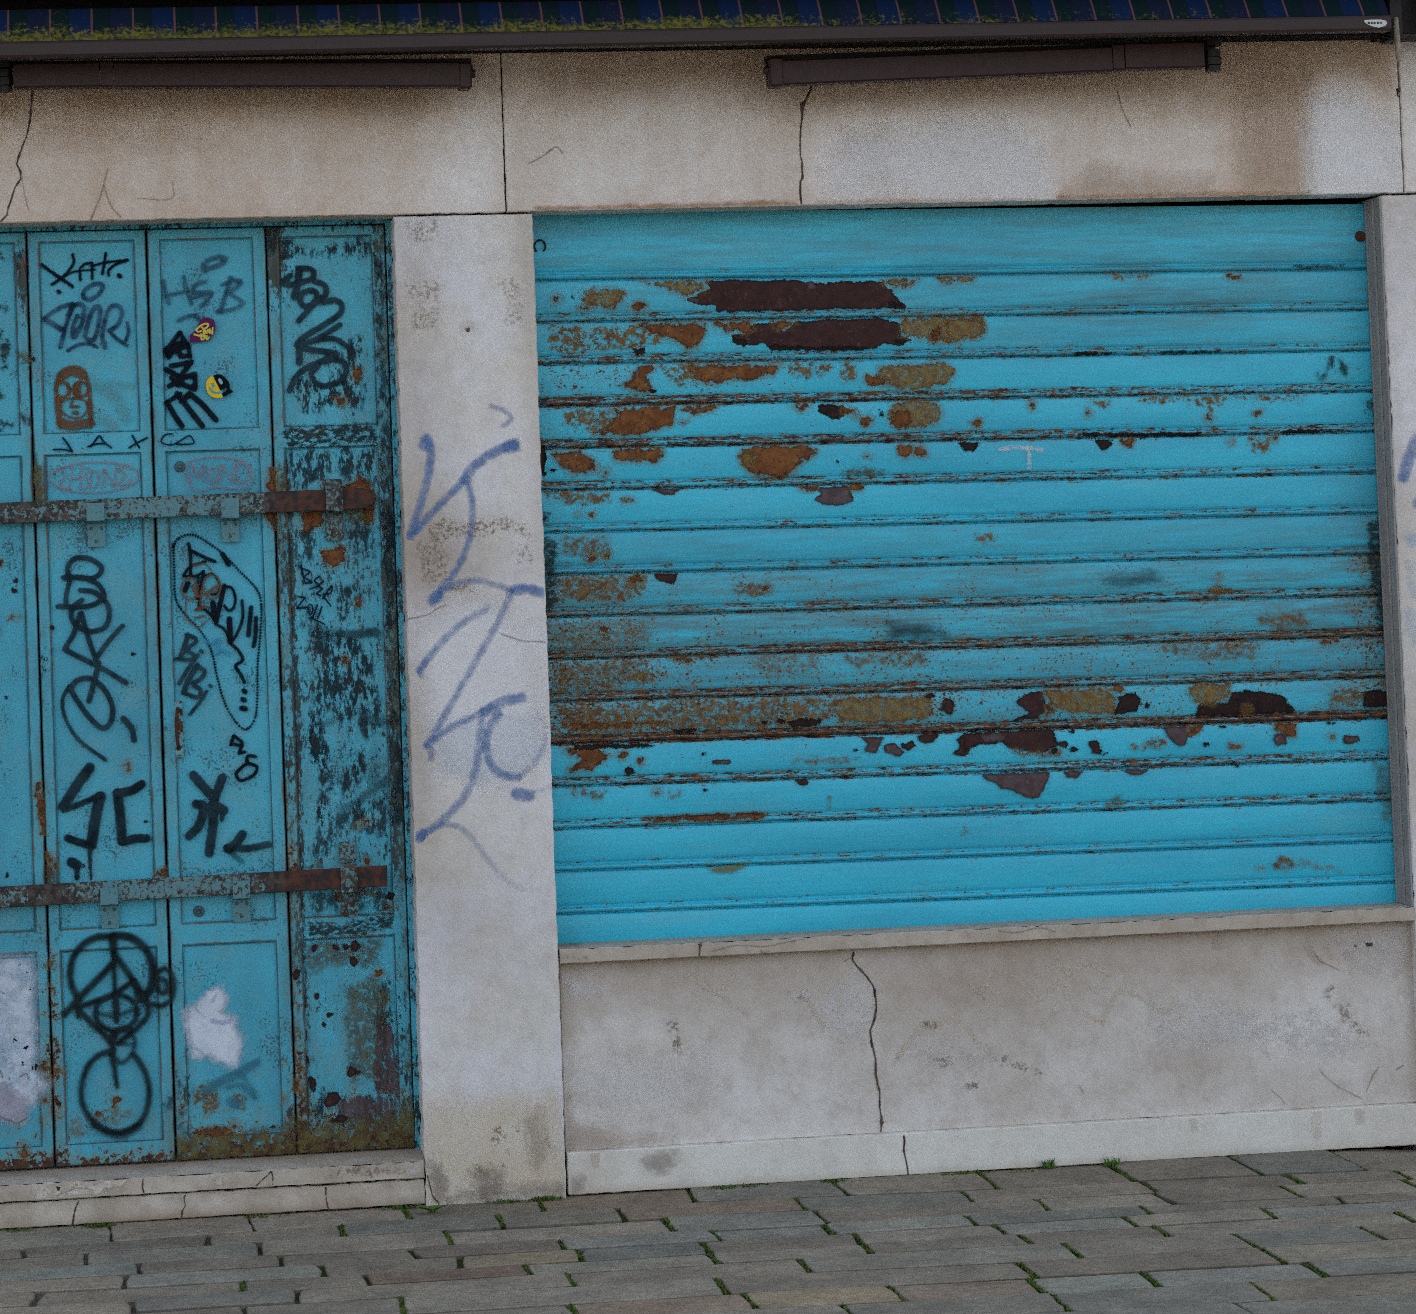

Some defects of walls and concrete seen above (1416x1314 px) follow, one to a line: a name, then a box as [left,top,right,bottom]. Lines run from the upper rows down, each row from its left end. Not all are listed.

crack [0,90,34,222]
crack [799,86,812,204]
corrosion [901,314,985,344]
corrosion [545,287,955,518]
corrosion [1082,392,1304,450]
corrosion [1232,428,1331,454]
corrosion [555,535,678,603]
corrosion [554,658,934,799]
corrosion [1326,675,1387,745]
corrosion [177,1055,415,1160]
corrosion [292,940,393,1079]
crack [852,952,909,1175]